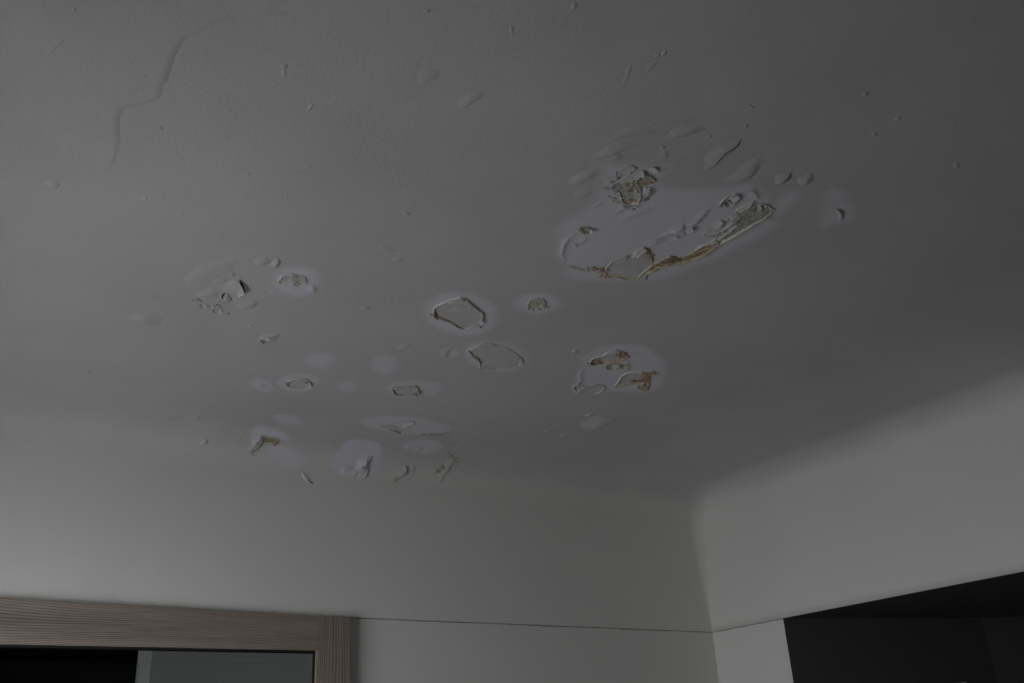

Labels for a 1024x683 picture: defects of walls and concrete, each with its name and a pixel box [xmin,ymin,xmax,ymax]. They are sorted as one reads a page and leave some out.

spalling [594,165,667,219]
peeling [561,189,776,281]
peeling [430,296,485,330]
peeling [572,350,660,395]
peeling [248,435,280,456]